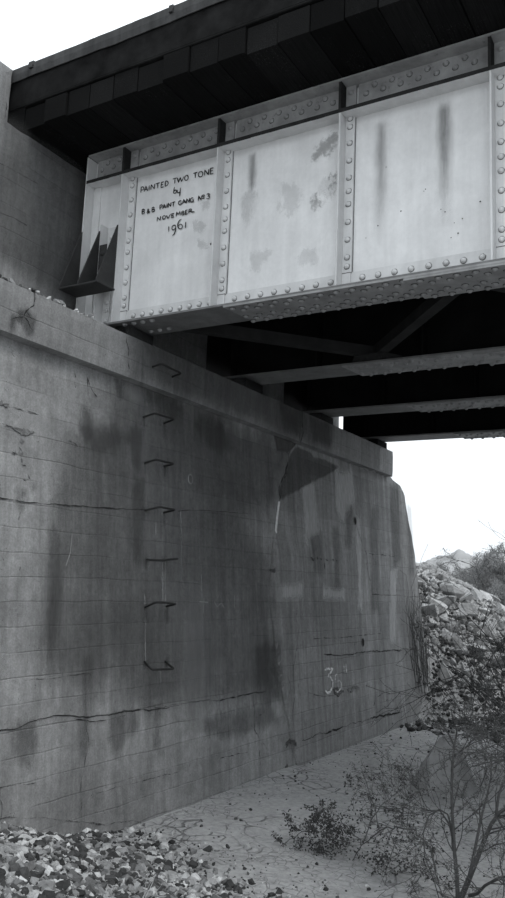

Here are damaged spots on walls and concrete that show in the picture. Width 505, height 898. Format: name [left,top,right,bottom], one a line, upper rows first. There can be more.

crack [0,497,145,510]
crack [289,605,403,740]
crack [0,691,266,825]